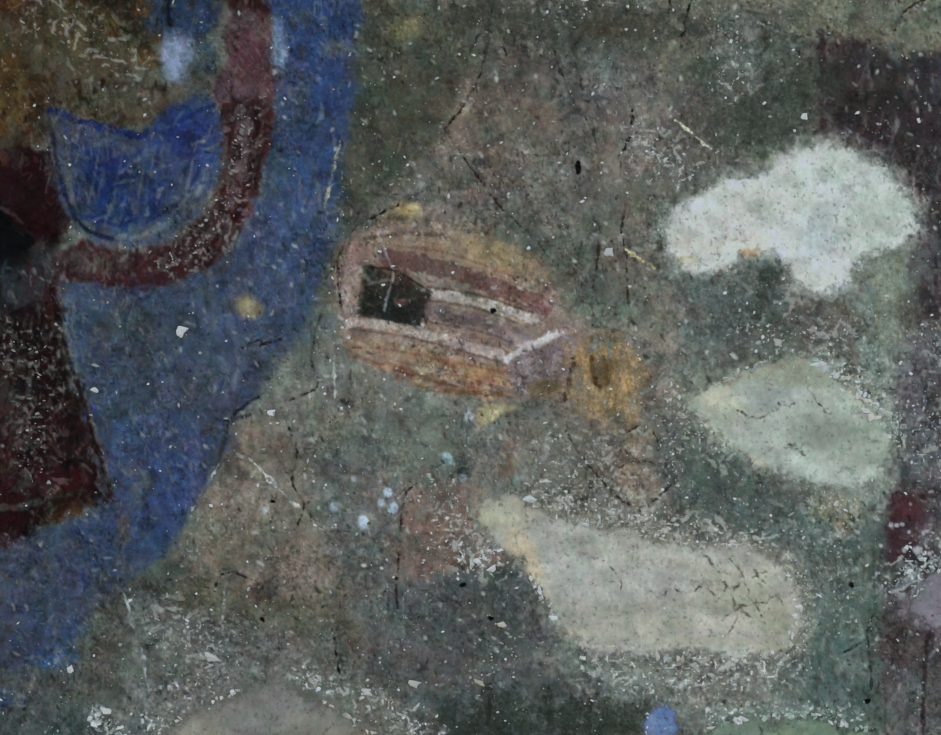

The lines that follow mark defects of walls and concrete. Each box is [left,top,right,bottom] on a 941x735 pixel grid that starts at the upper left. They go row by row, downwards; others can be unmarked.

crack [444,34,481,131]
crack [460,152,521,227]
crack [225,396,260,438]
spalling [407,317,941,735]